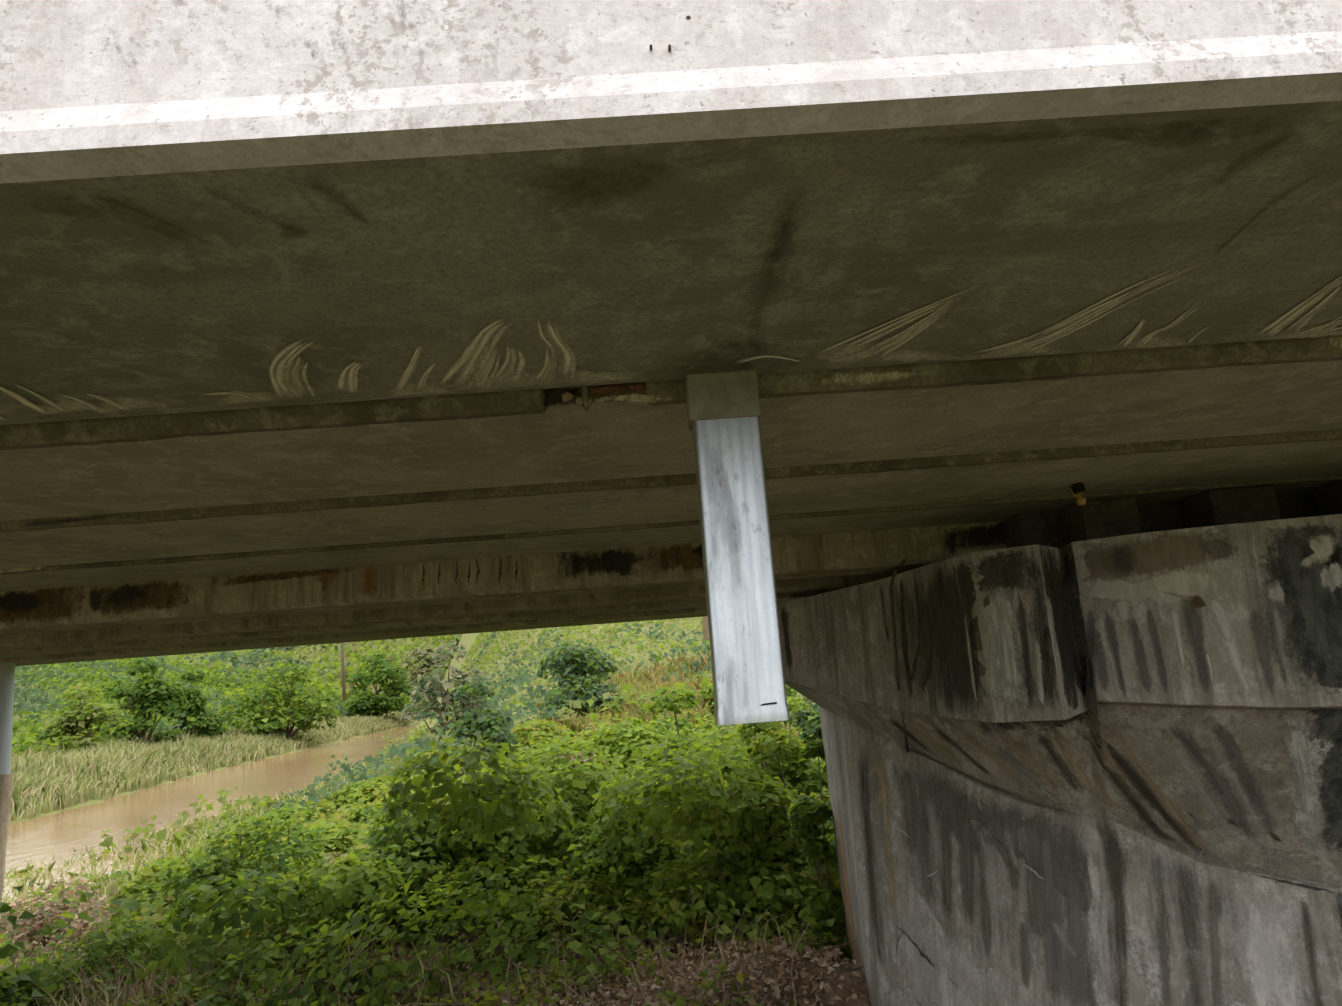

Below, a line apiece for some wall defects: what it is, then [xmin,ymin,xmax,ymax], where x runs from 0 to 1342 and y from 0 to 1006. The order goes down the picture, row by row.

spalling [543,383,670,405]
leakage [881,522,1236,722]
leakage [1171,600,1250,690]
leakage [1252,610,1286,690]
leakage [1009,734,1202,849]
leakage [1149,725,1273,835]
leakage [834,720,1126,1006]
leakage [1152,857,1222,1006]
leakage [1303,904,1323,1006]